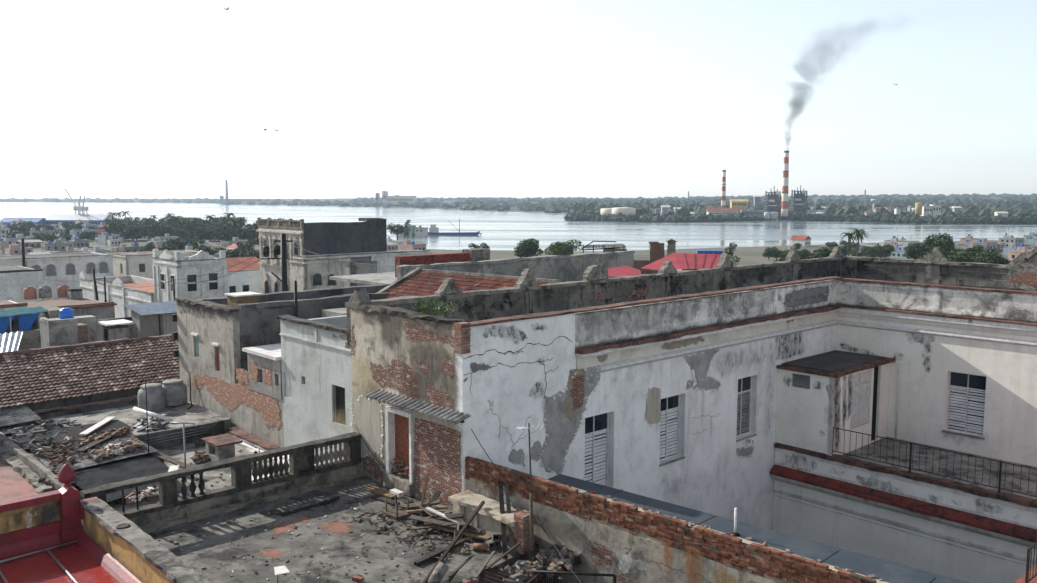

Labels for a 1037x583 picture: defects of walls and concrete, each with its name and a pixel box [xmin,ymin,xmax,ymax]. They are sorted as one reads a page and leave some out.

flaking render [182,362,282,429]
peeling [350,394,384,483]
flaking render [369,317,491,410]
flaking render [414,418,461,505]
crack [464,336,572,453]
peeling [536,354,608,474]
peeling [645,387,662,427]
peeling [662,336,722,393]